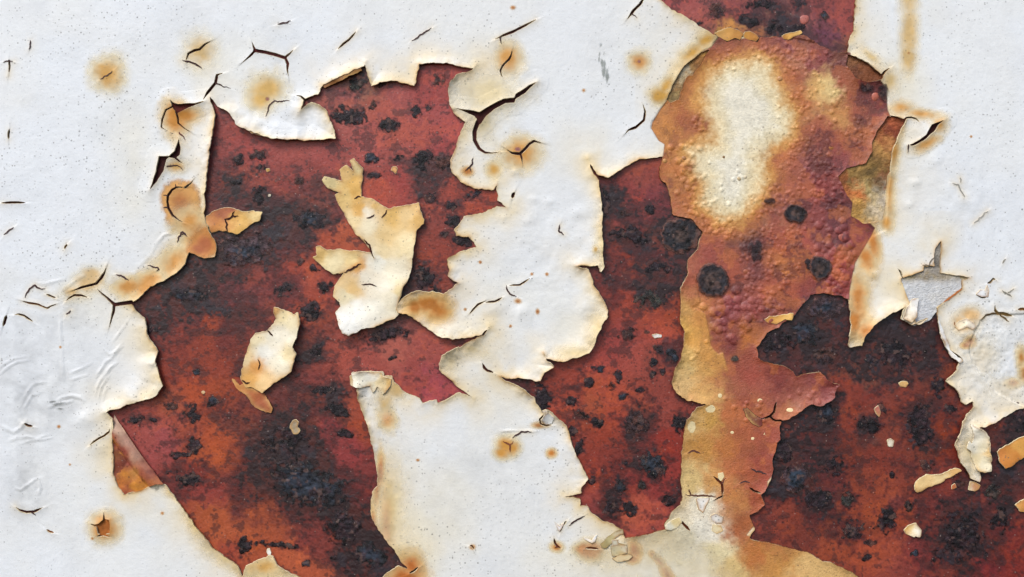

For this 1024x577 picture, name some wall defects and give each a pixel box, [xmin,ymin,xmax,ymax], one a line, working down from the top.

crack [151,43,229,242]
crack [246,45,292,72]
crack [459,21,539,171]
peeling [662,0,883,82]
crack [3,265,159,325]
corrosion [65,160,216,301]
peeling [107,63,505,577]
peeling [502,157,705,562]
corrosion [650,0,947,577]
peeling [750,243,1024,577]
corrosion [187,516,288,577]
corrosion [371,451,426,577]